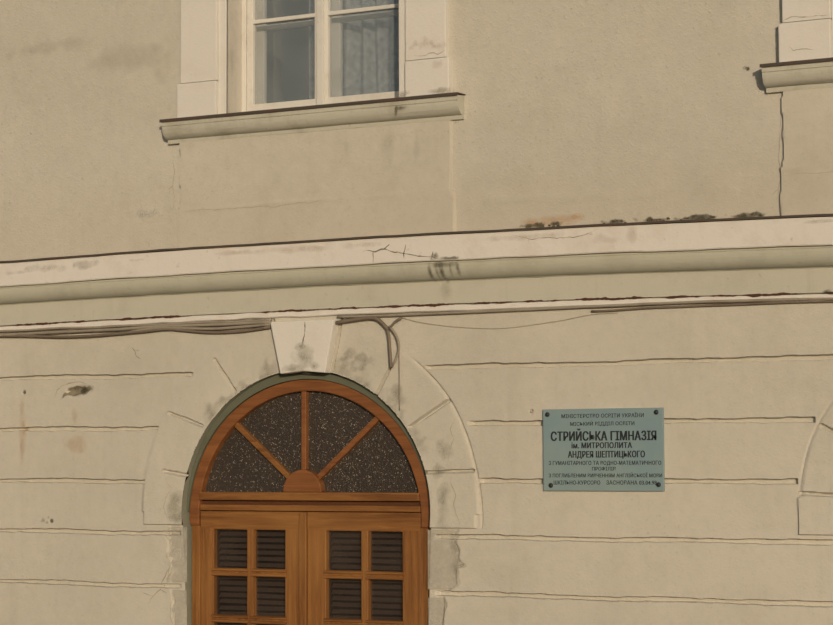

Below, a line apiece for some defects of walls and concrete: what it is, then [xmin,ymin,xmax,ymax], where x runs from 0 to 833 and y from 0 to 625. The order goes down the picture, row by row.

crack [362,245,438,259]
crack [261,292,805,344]
spalling [54,382,90,400]